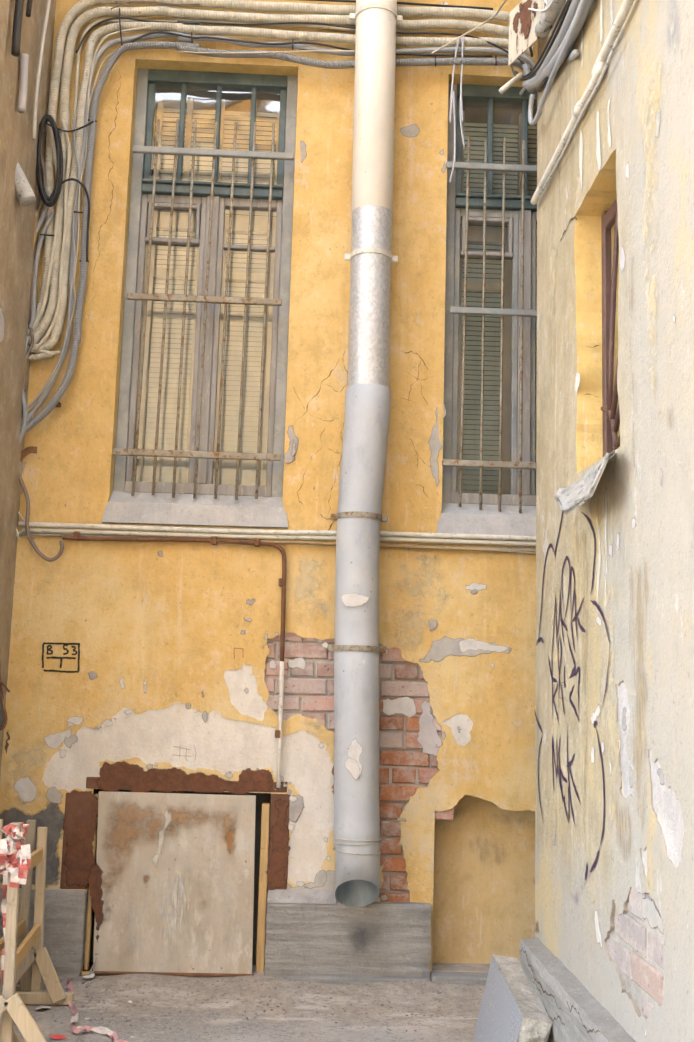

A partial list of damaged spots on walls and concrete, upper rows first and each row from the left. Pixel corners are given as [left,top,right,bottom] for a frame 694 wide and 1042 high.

crack [294,352,348,536]
peeling [341,584,369,607]
peeling [14,632,362,890]
spalling [379,620,511,902]
peeling [610,683,634,798]
peeling [649,750,684,867]
crack [520,948,601,1035]